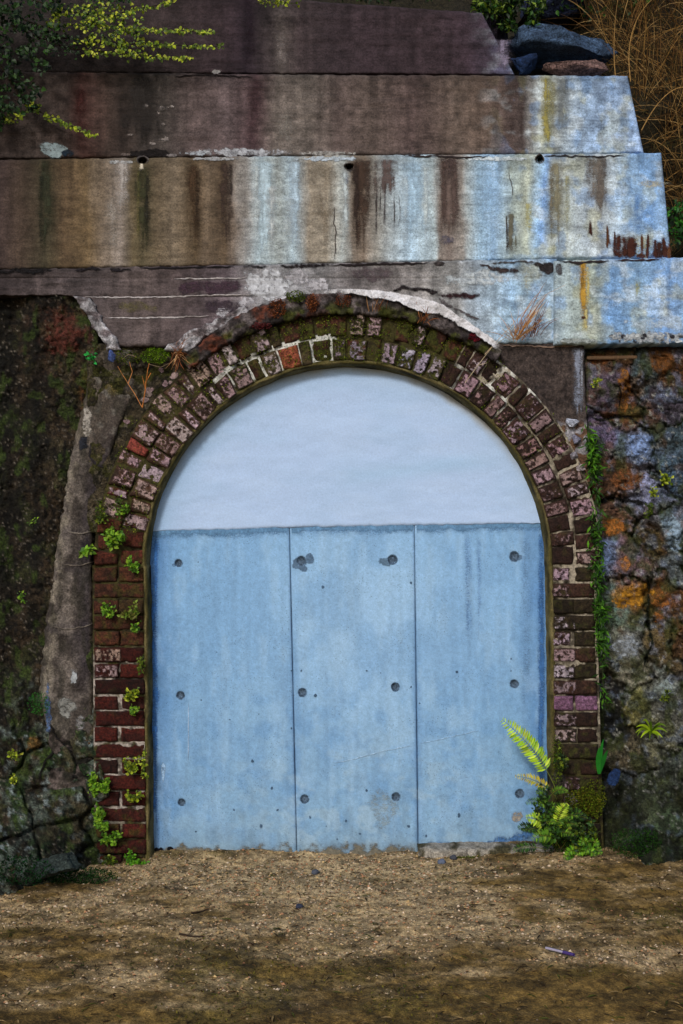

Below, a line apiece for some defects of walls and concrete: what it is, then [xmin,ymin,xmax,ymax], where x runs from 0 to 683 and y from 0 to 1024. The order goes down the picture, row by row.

damp [108,160,150,245]
damp [185,115,527,254]
corrosion [606,226,672,259]
corrosion [580,261,590,328]
crack [39,722,89,778]